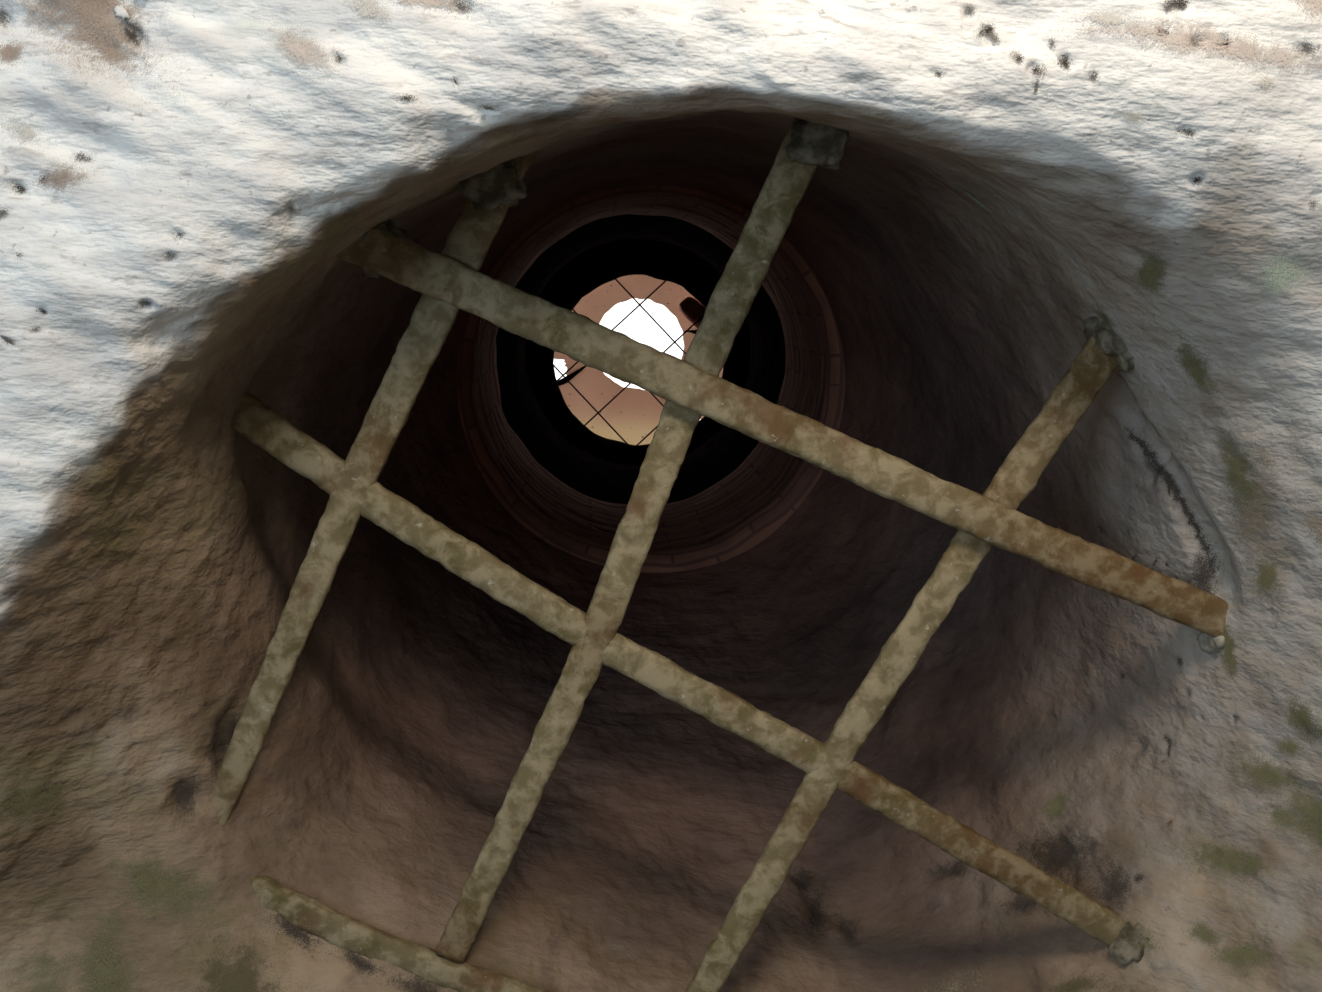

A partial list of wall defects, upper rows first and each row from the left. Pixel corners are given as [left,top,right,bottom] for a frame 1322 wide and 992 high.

crack [1107,415,1239,680]
water stain [1007,792,1142,911]